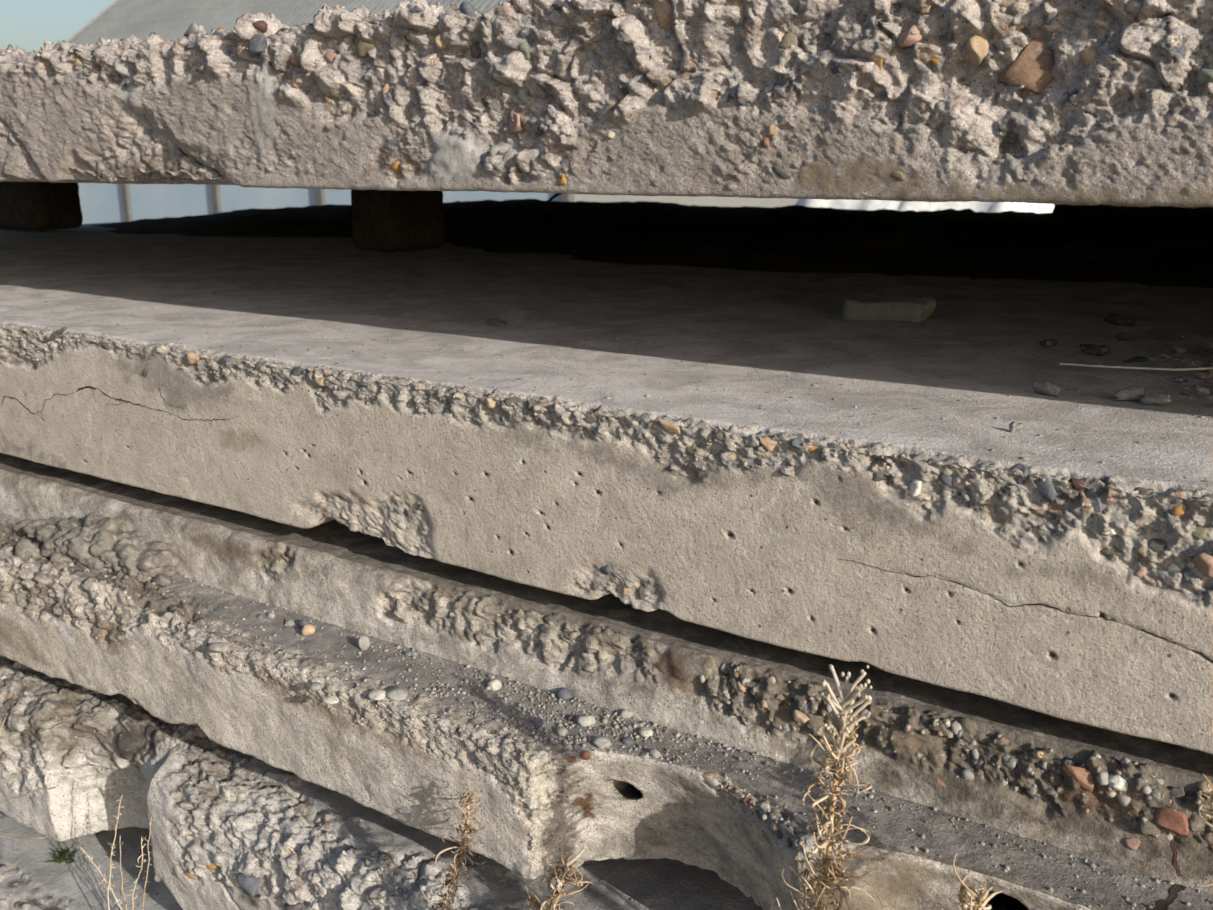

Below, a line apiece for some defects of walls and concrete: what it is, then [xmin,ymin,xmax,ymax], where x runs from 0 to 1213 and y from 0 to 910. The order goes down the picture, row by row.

spalling [0,0,1213,185]
crack [2,386,233,421]
spalling [0,320,1213,610]
crack [841,559,1213,663]
spalling [0,519,577,865]
corrosion [571,794,595,818]
crack [1148,839,1186,910]